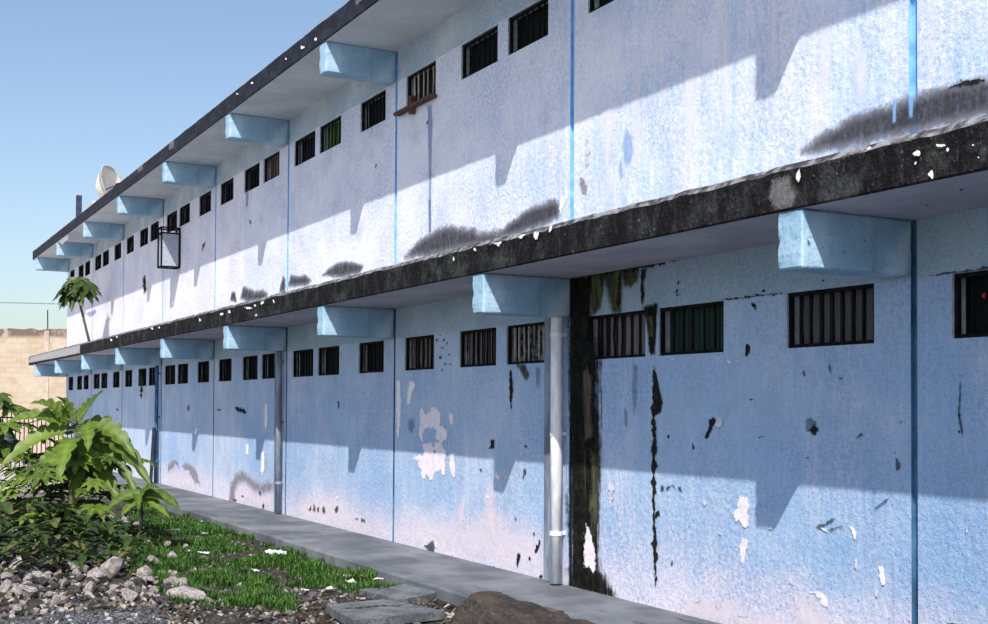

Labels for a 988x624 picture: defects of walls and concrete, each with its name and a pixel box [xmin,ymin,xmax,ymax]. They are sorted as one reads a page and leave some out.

damp [801,76,988,154]
damp [404,197,566,258]
mould [230,287,268,302]
mould [280,275,311,293]
mould [322,261,363,278]
crack [929,266,988,276]
peeling [396,380,455,480]
damp [565,260,679,597]
damp [167,459,207,495]
damp [229,473,272,509]
peeling [733,495,750,565]